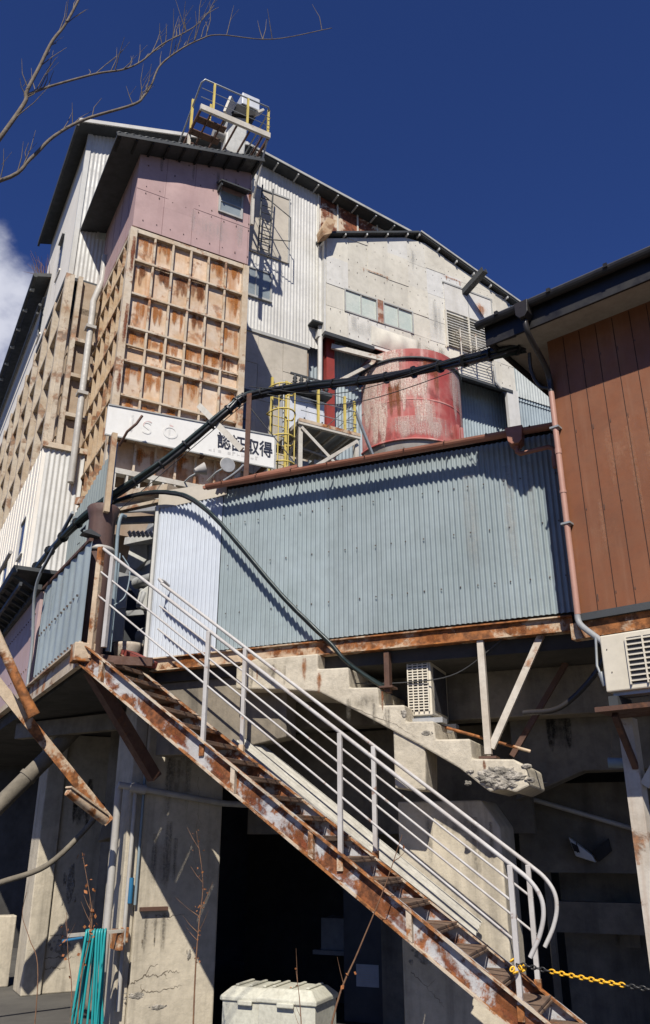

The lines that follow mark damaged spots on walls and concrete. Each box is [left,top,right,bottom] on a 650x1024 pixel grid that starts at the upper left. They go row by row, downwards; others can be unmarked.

rust [129,237,204,302]
rust [123,303,233,399]
rust [117,364,175,416]
rust [389,379,403,414]
spalling [464,764,547,791]
crack [130,964,182,993]